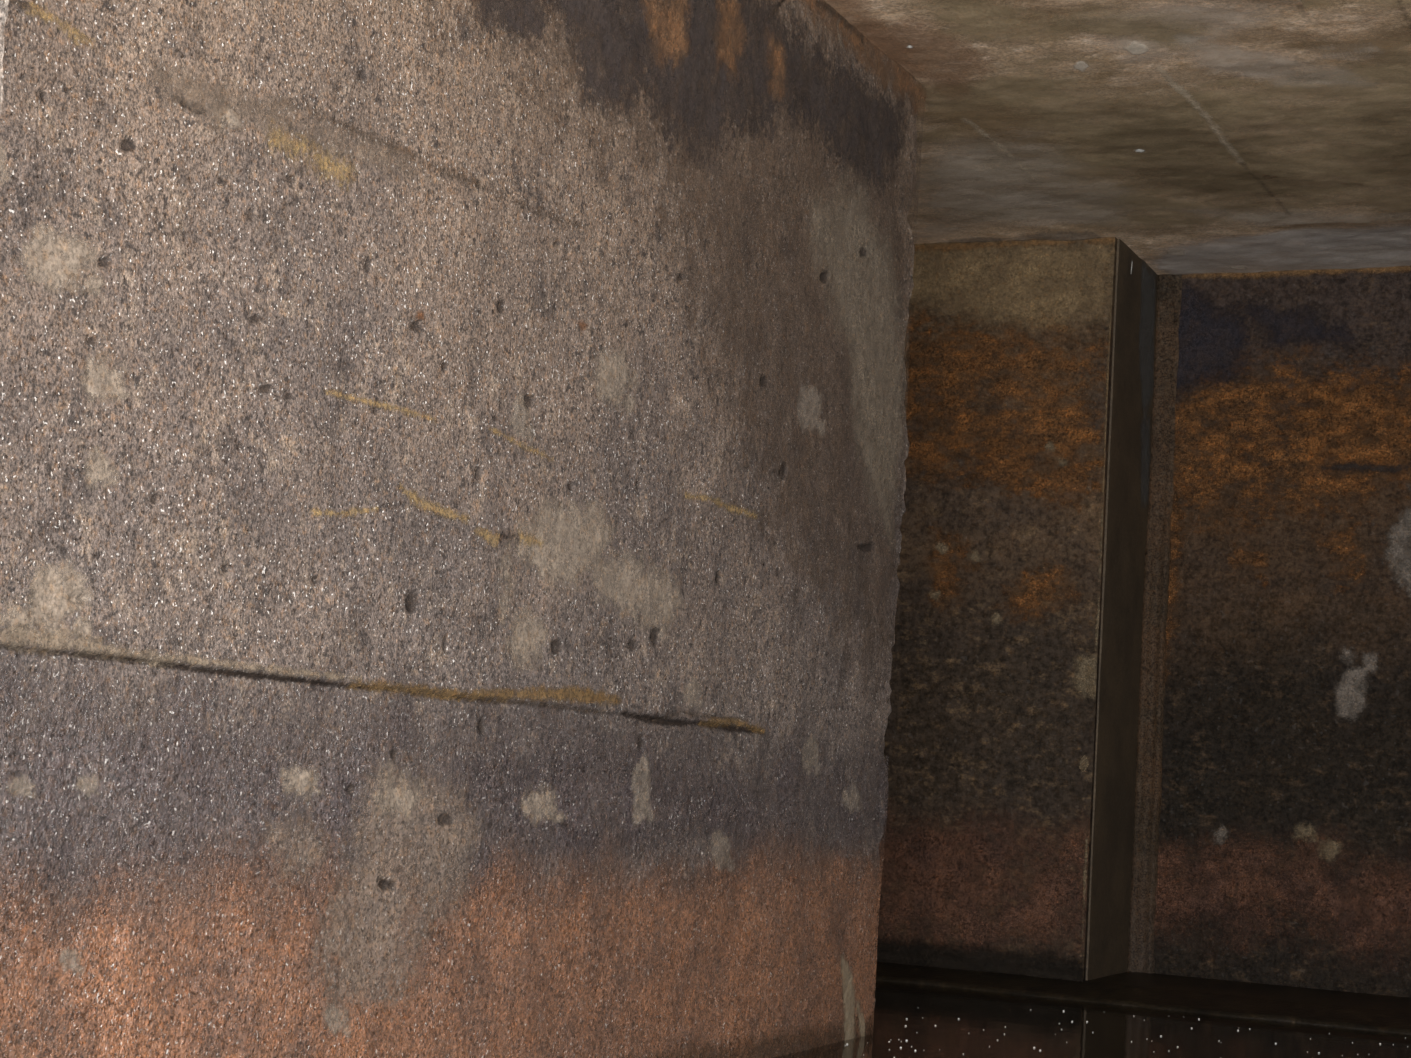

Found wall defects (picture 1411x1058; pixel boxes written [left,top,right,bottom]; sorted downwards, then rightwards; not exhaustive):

damp [473,0,1411,644]
damp [400,485,500,547]
crack [0,625,765,734]
corrosion [0,851,884,1058]